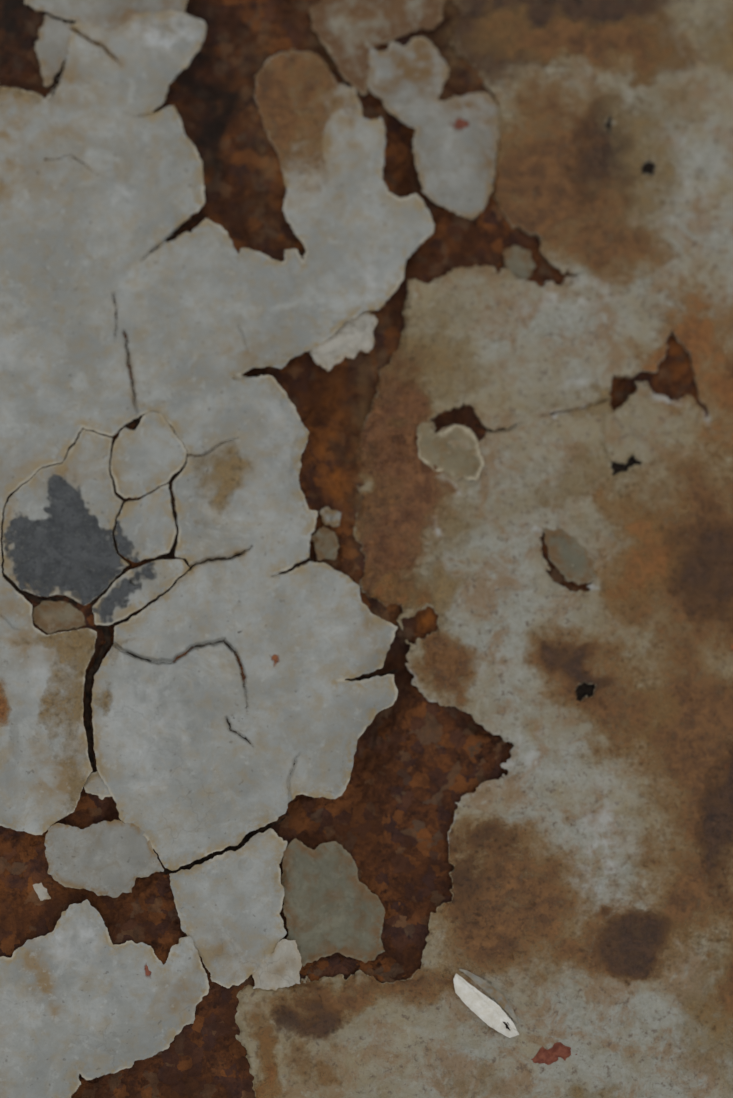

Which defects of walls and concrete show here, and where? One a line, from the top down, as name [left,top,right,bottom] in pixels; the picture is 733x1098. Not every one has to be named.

rust [255,51,343,169]
spalling [609,333,709,418]
crack [0,293,261,772]
rust [197,447,250,508]
peeling [0,0,571,1098]
rust [0,683,10,724]
rust [25,629,96,737]
rust [248,285,733,1098]